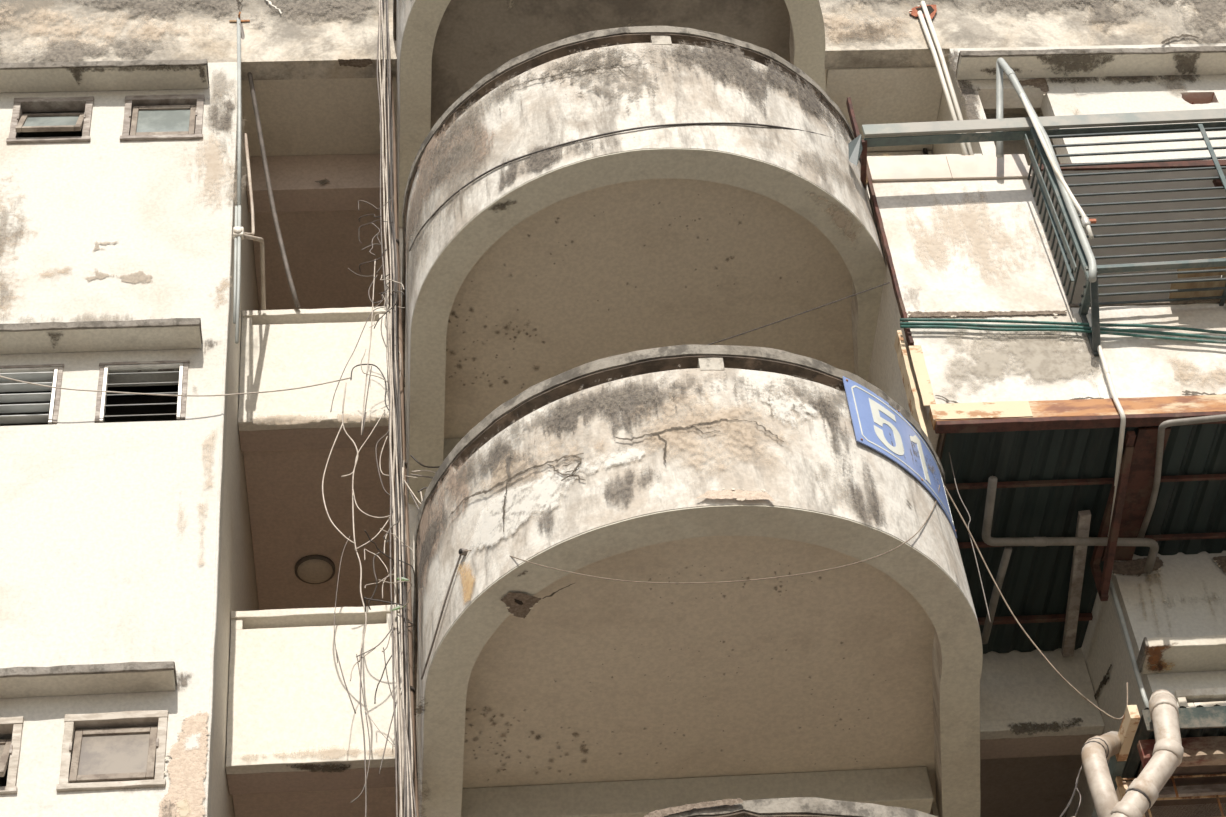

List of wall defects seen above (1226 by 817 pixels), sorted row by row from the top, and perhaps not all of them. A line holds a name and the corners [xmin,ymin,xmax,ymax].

damp [823,0,936,41]
damp [941,48,980,120]
damp [405,42,855,279]
crack [616,418,784,463]
crack [449,453,585,532]
damp [417,369,887,642]
spalling [501,592,541,619]
flaking render [158,710,209,817]